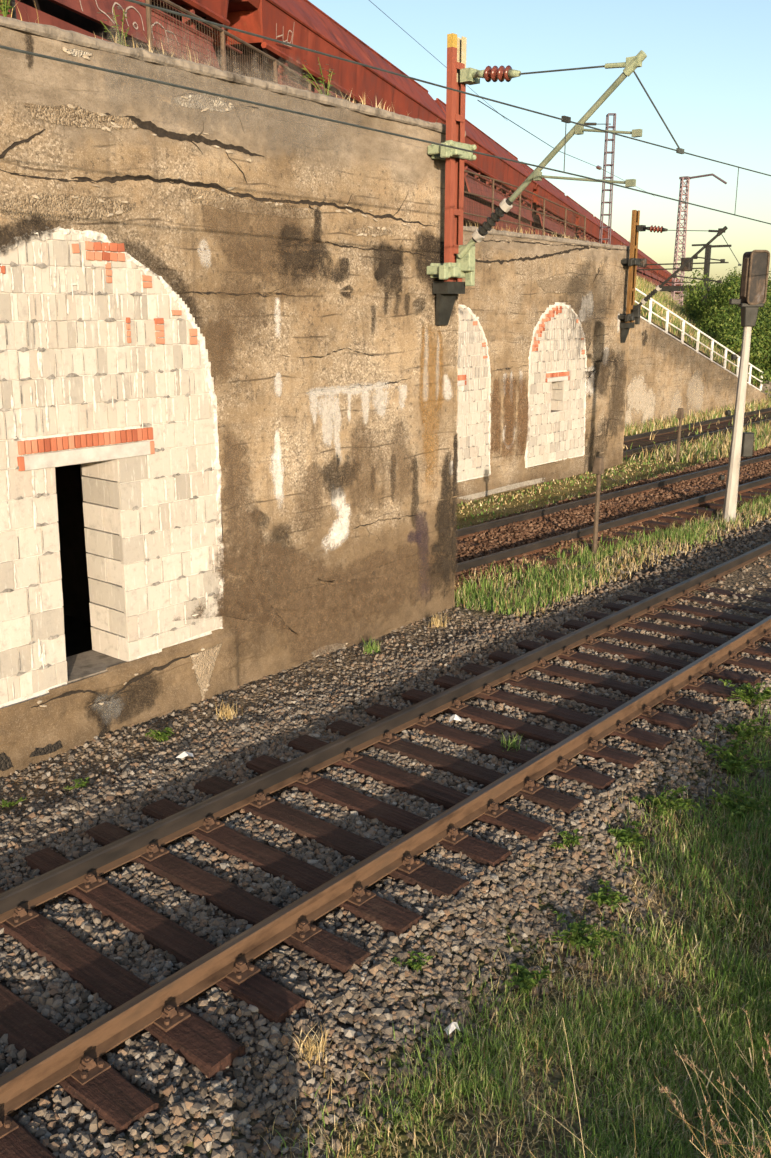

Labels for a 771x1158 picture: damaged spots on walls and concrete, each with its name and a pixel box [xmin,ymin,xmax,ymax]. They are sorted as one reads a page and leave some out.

spalling [24,103,138,132]
spalling [174,93,234,112]
crack [0,93,439,258]
damp [205,206,353,376]
damp [372,232,444,326]
damp [442,375,451,399]
damp [586,348,623,472]
damp [217,383,459,665]
damp [85,674,161,735]